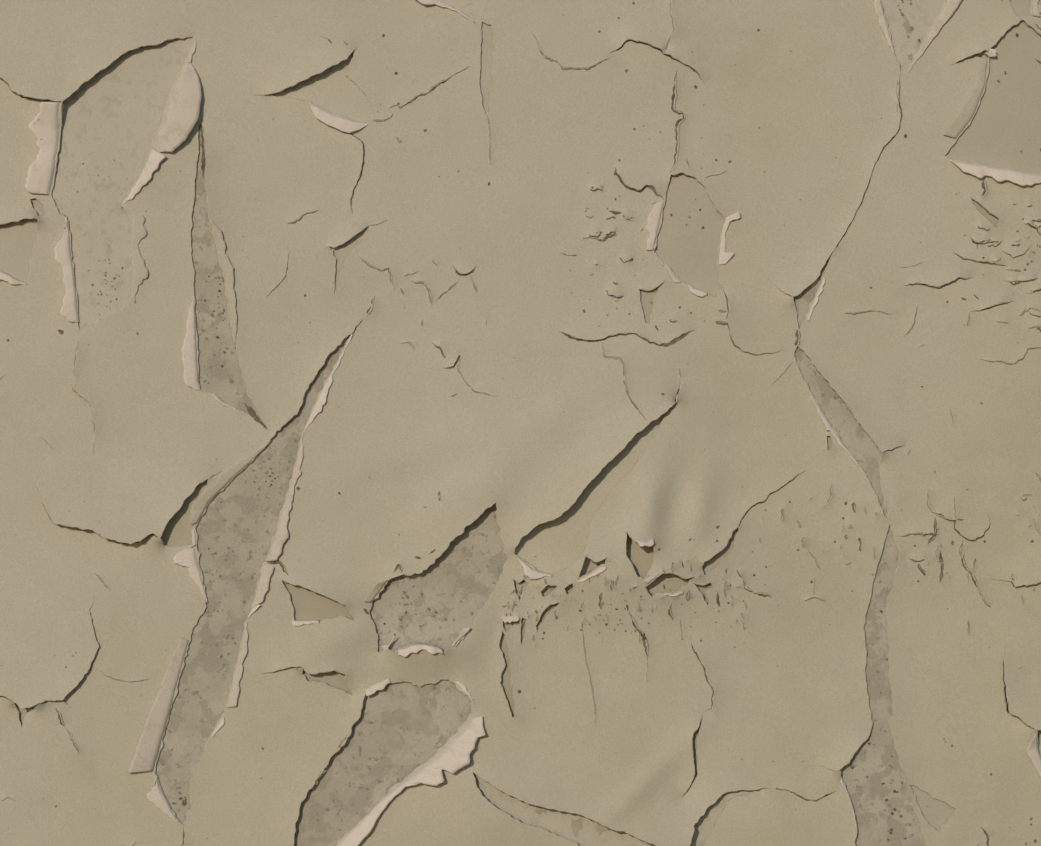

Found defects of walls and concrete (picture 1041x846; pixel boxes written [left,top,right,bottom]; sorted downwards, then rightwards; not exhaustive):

peeling [0,0,202,449]
peeling [243,11,485,305]
peeling [874,0,962,112]
peeling [894,0,1041,365]
peeling [37,113,990,846]
peeling [0,595,157,758]
peeling [979,618,1041,777]